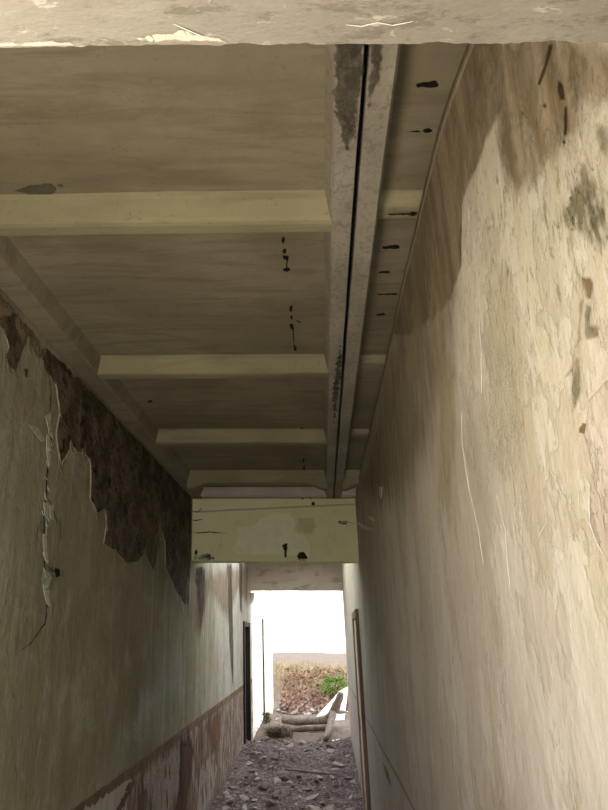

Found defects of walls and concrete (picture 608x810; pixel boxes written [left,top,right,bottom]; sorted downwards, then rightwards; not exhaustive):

peeling [137,30,226,43]
damp [332,44,382,150]
damp [367,40,608,493]
crack [20,370,61,651]
spalling [0,296,191,617]
peeling [84,746,180,810]